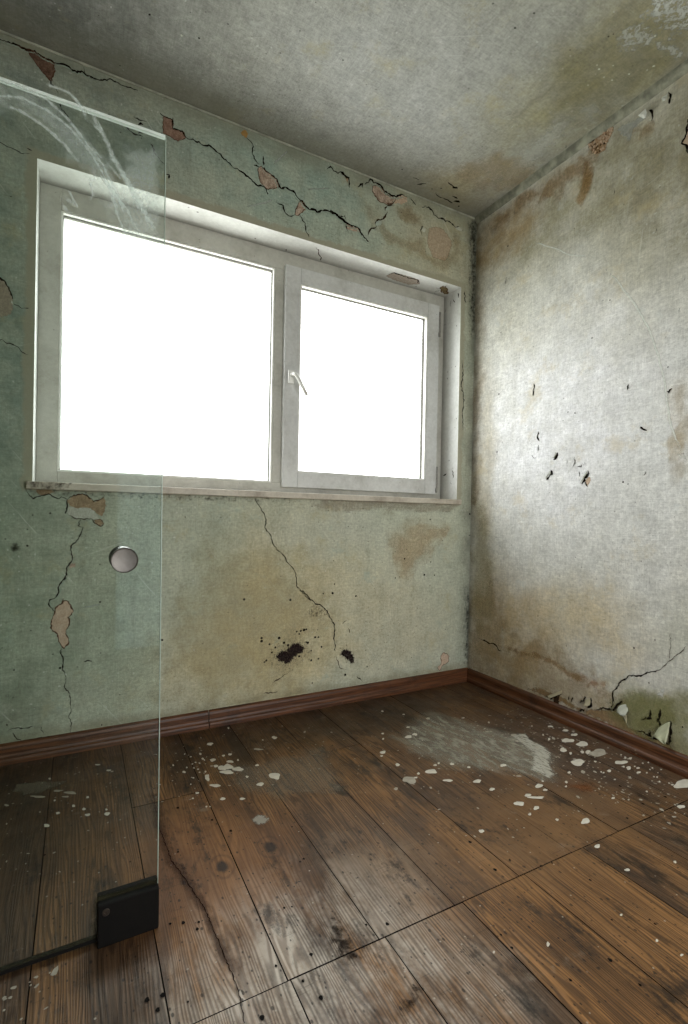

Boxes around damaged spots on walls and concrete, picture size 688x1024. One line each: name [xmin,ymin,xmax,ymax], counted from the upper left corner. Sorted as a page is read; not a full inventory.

spalling [19,46,72,126]
crack [0,39,138,91]
spalling [160,113,186,141]
crack [186,137,463,244]
spalling [65,493,106,527]
crack [48,521,83,611]
crack [255,499,363,682]
spalling [50,600,74,649]
damp [260,628,322,671]
damp [340,649,355,664]
crack [611,638,686,709]
peeling [528,687,673,750]